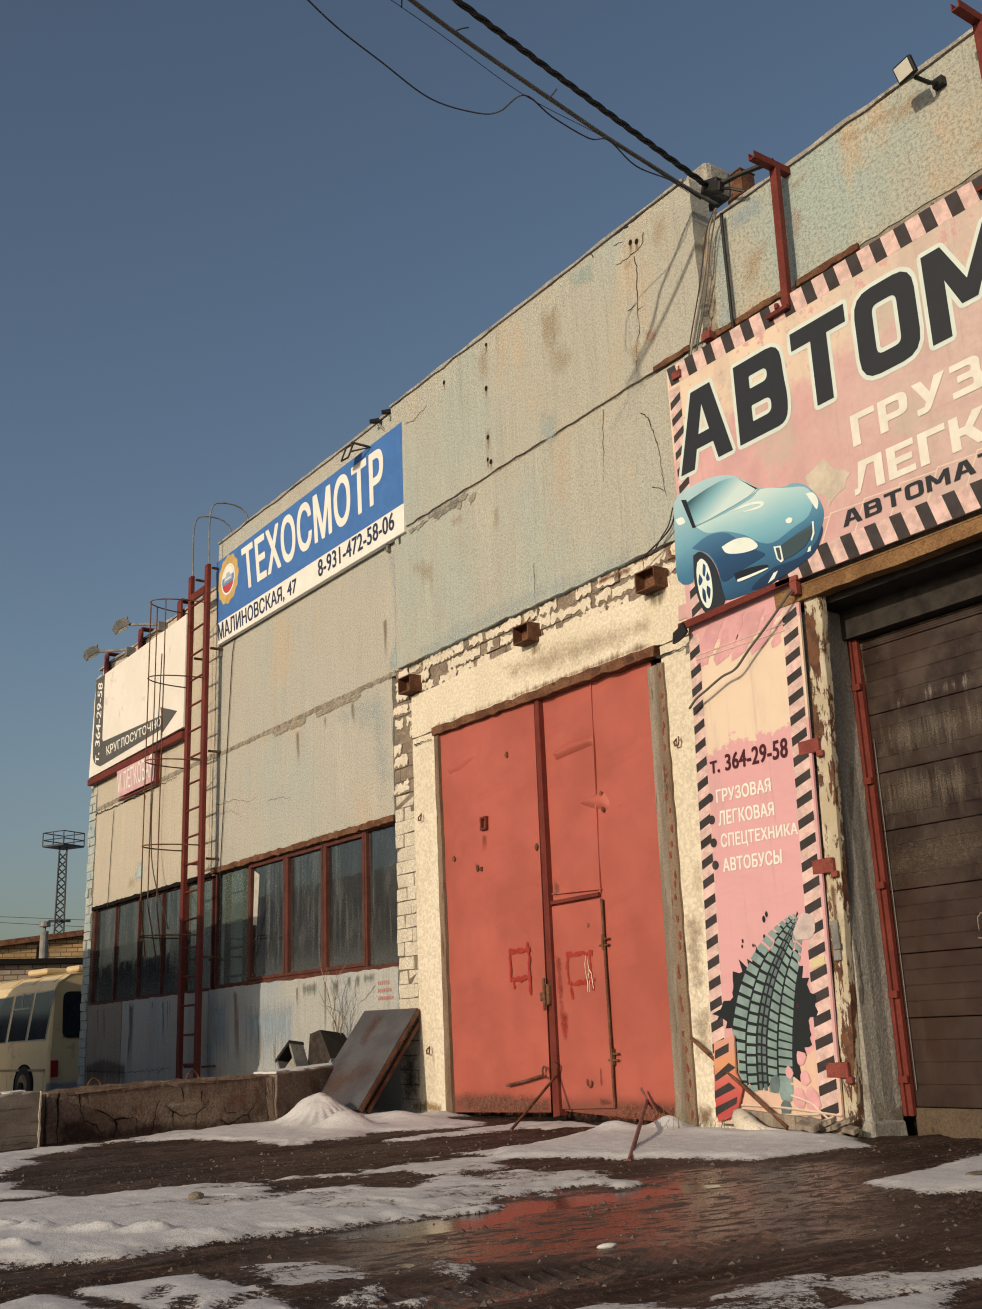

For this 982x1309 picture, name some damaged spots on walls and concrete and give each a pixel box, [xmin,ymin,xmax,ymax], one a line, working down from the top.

peeling [391,542,679,795]